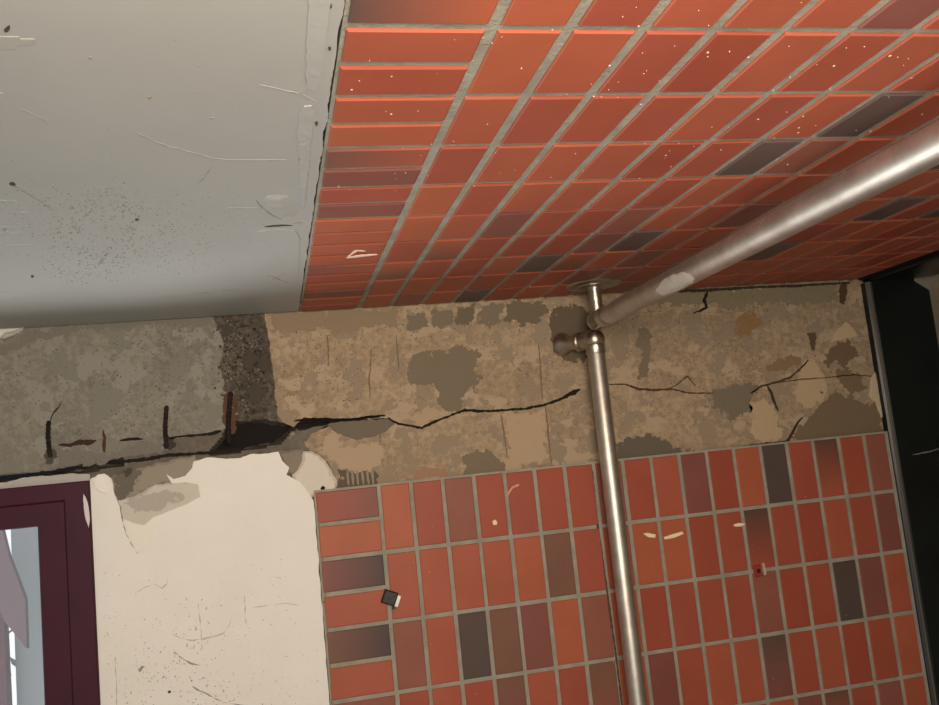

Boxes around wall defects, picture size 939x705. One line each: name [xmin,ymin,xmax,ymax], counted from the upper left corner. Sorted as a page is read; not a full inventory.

rust [44,430,106,465]
rust [222,391,239,434]
peeling [0,295,595,525]
crack [609,375,712,394]
peeling [600,280,874,452]
crack [735,360,871,447]
crack [0,430,243,554]